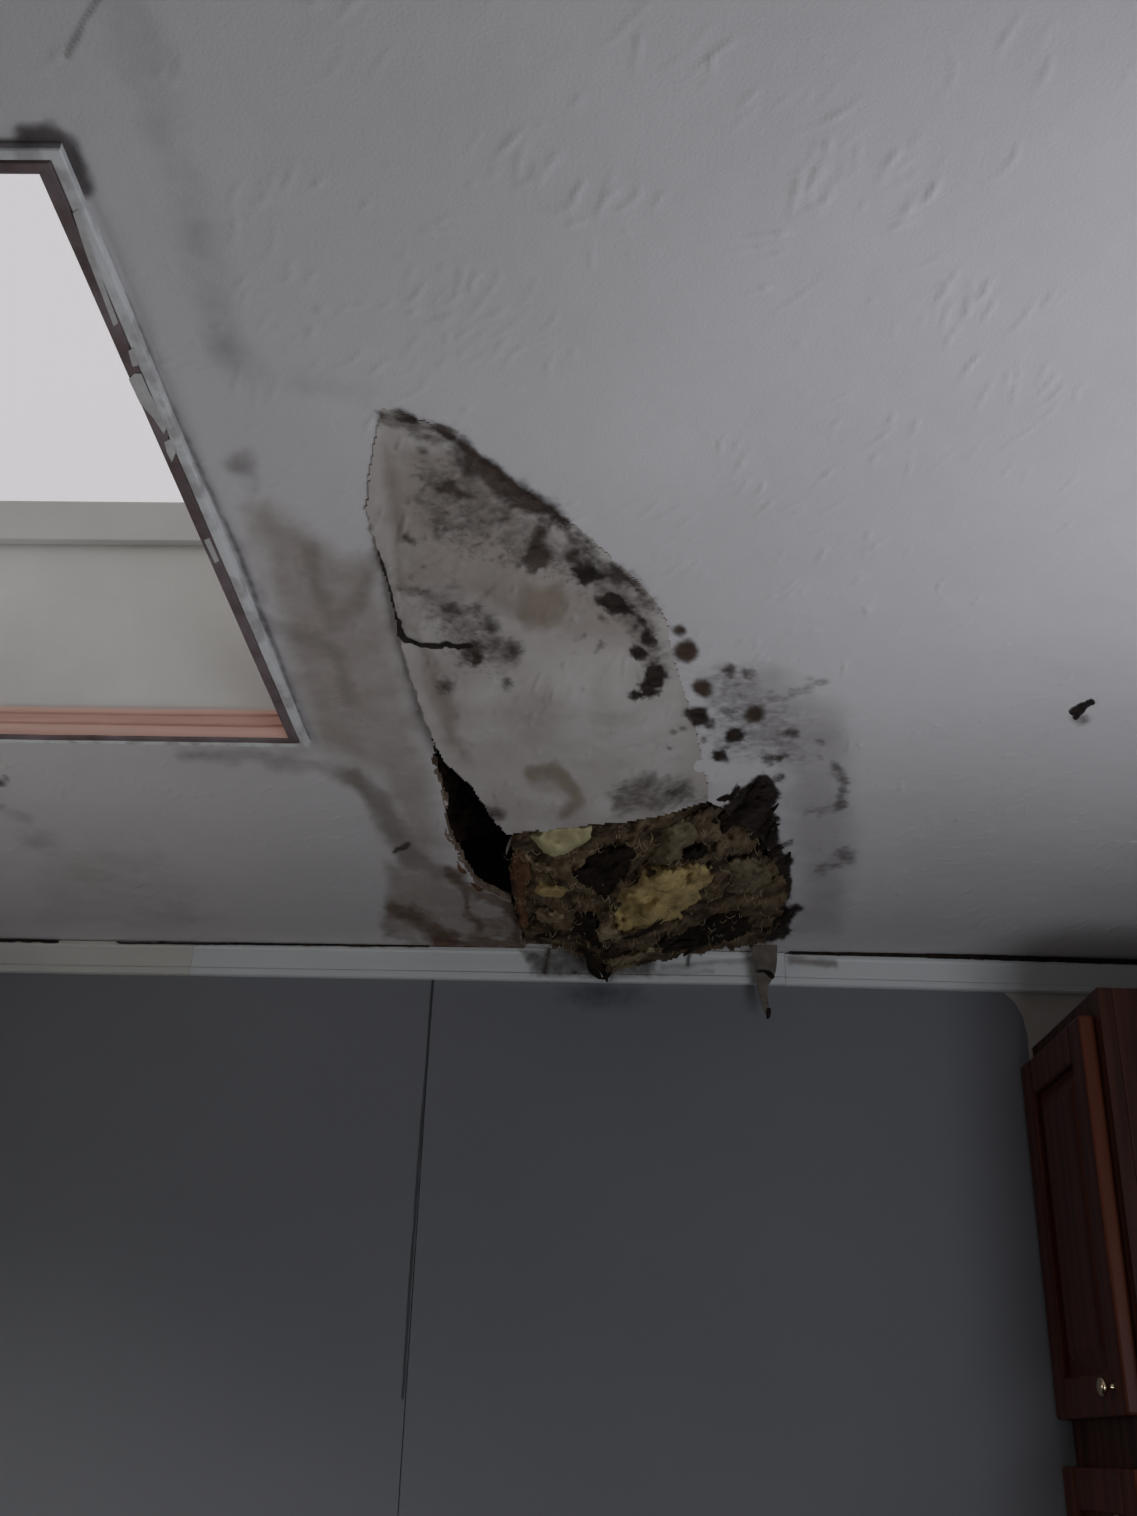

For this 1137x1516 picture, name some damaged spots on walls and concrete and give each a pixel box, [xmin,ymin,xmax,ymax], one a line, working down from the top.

crack [378,550,473,650]
damp [396,410,698,701]
damp [685,681,763,761]
damp [614,777,692,809]
damp [723,756,803,944]